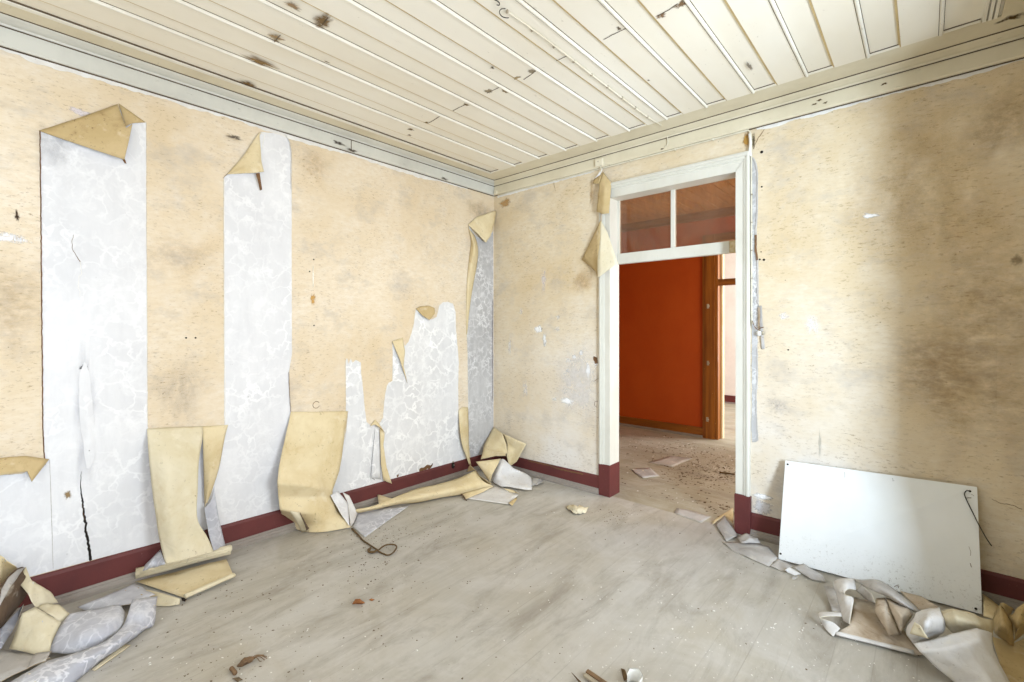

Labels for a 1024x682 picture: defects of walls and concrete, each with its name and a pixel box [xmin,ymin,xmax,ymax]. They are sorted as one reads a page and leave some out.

peeling [0,109,160,576]
crack [80,471,92,561]
peeling [197,132,292,530]
peeling [332,227,494,494]